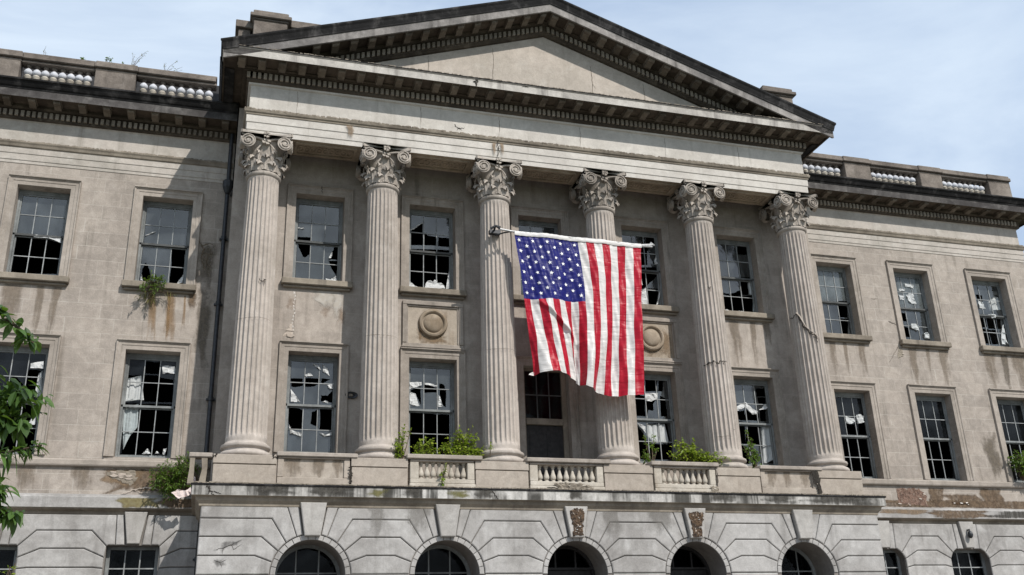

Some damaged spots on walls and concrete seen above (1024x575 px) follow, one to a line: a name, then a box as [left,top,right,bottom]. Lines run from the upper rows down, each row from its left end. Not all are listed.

crack [790,312,819,342]
flaking render [106,469,138,486]
peeling [896,487,928,507]